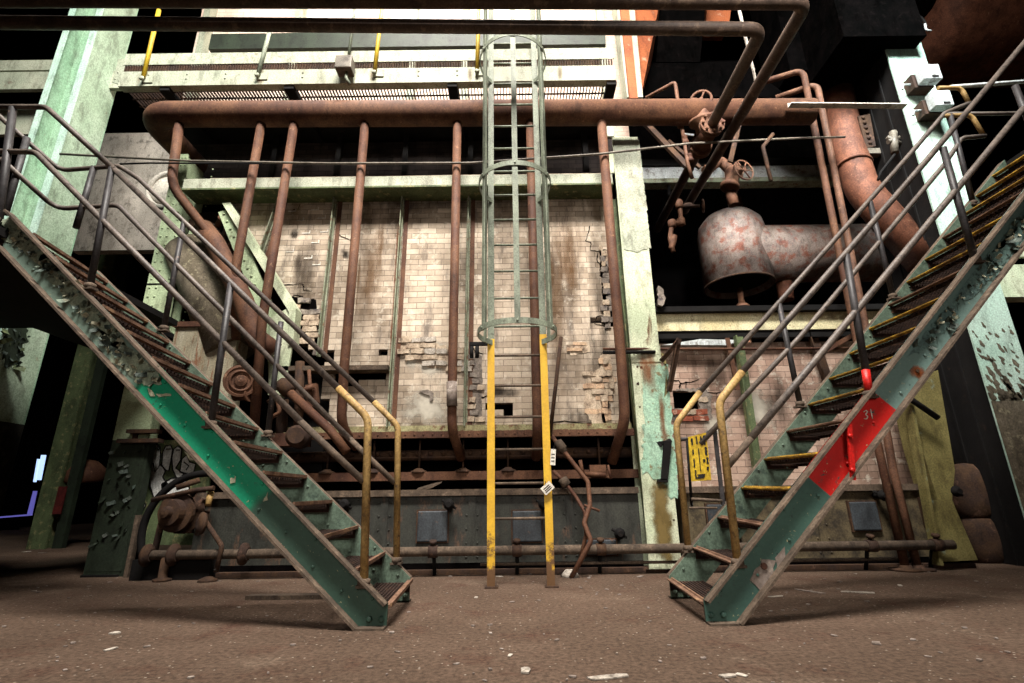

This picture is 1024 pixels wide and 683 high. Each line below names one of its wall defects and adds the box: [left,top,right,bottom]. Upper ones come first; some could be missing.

spalling [397,336,486,423]
peeling [316,342,713,499]
peeling [972,322,1024,401]
peeling [85,442,147,572]
rust [652,482,672,560]